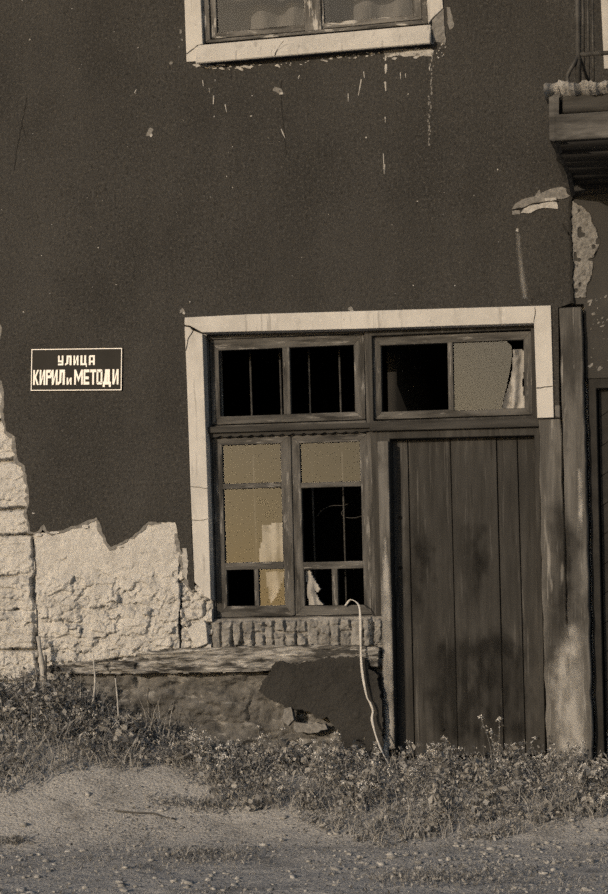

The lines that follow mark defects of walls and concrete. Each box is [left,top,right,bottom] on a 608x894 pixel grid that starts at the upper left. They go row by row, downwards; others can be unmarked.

flaking render [512,187,608,332]
flaking render [0,380,214,697]